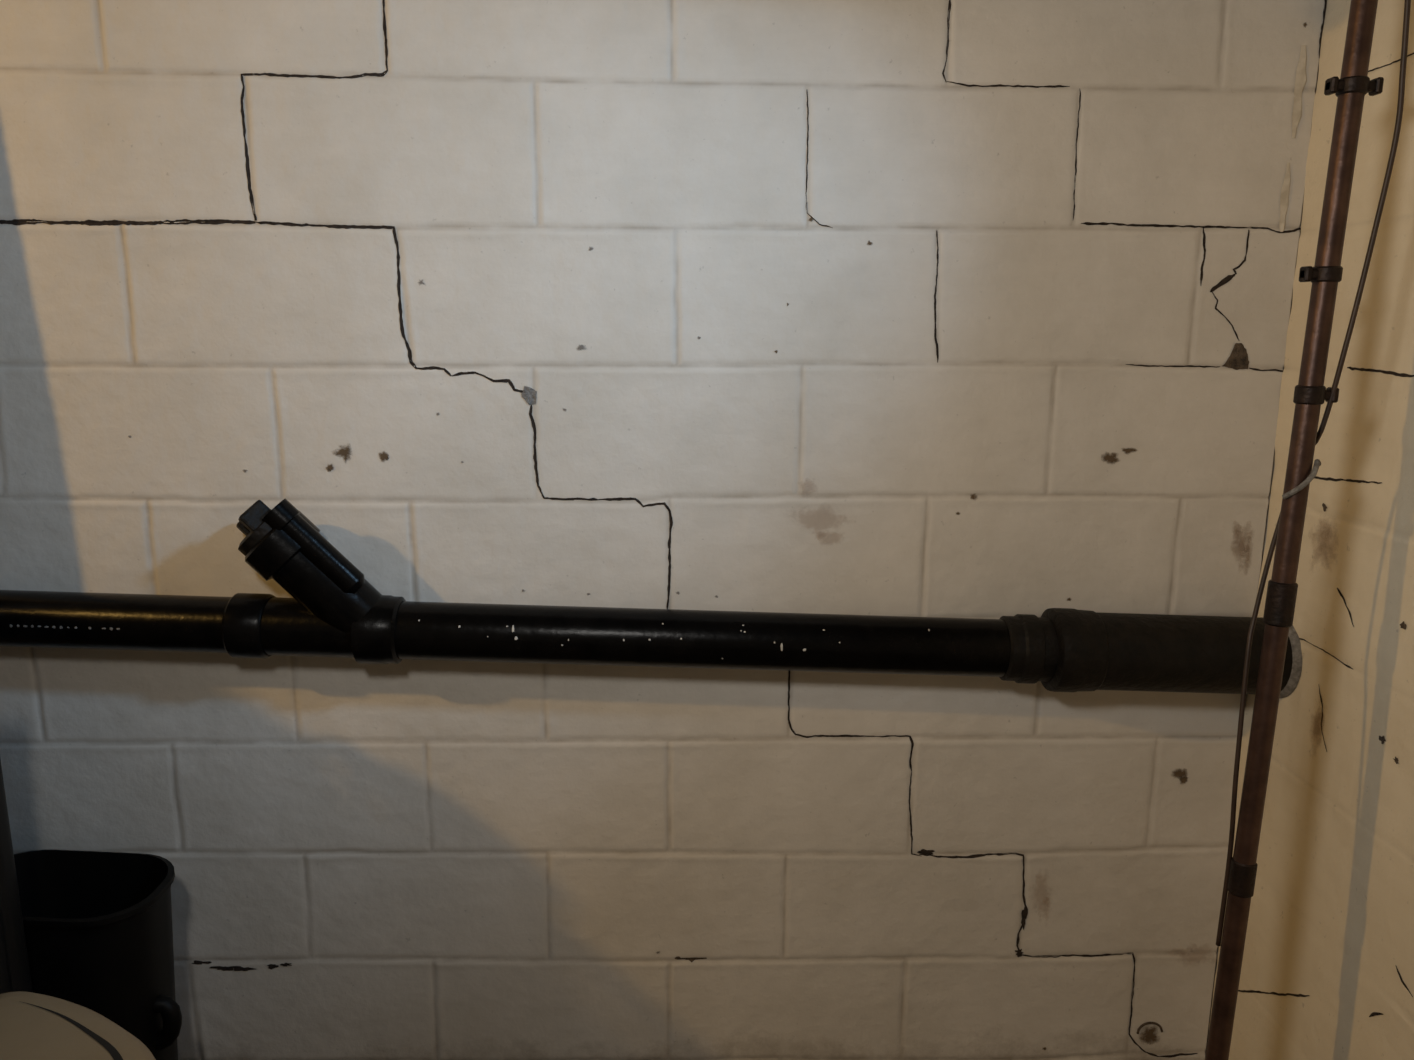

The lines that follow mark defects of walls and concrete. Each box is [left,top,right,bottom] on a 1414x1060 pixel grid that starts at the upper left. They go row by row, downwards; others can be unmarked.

crack [0,0,673,609]
crack [942,0,1301,372]
crack [788,671,1198,1057]